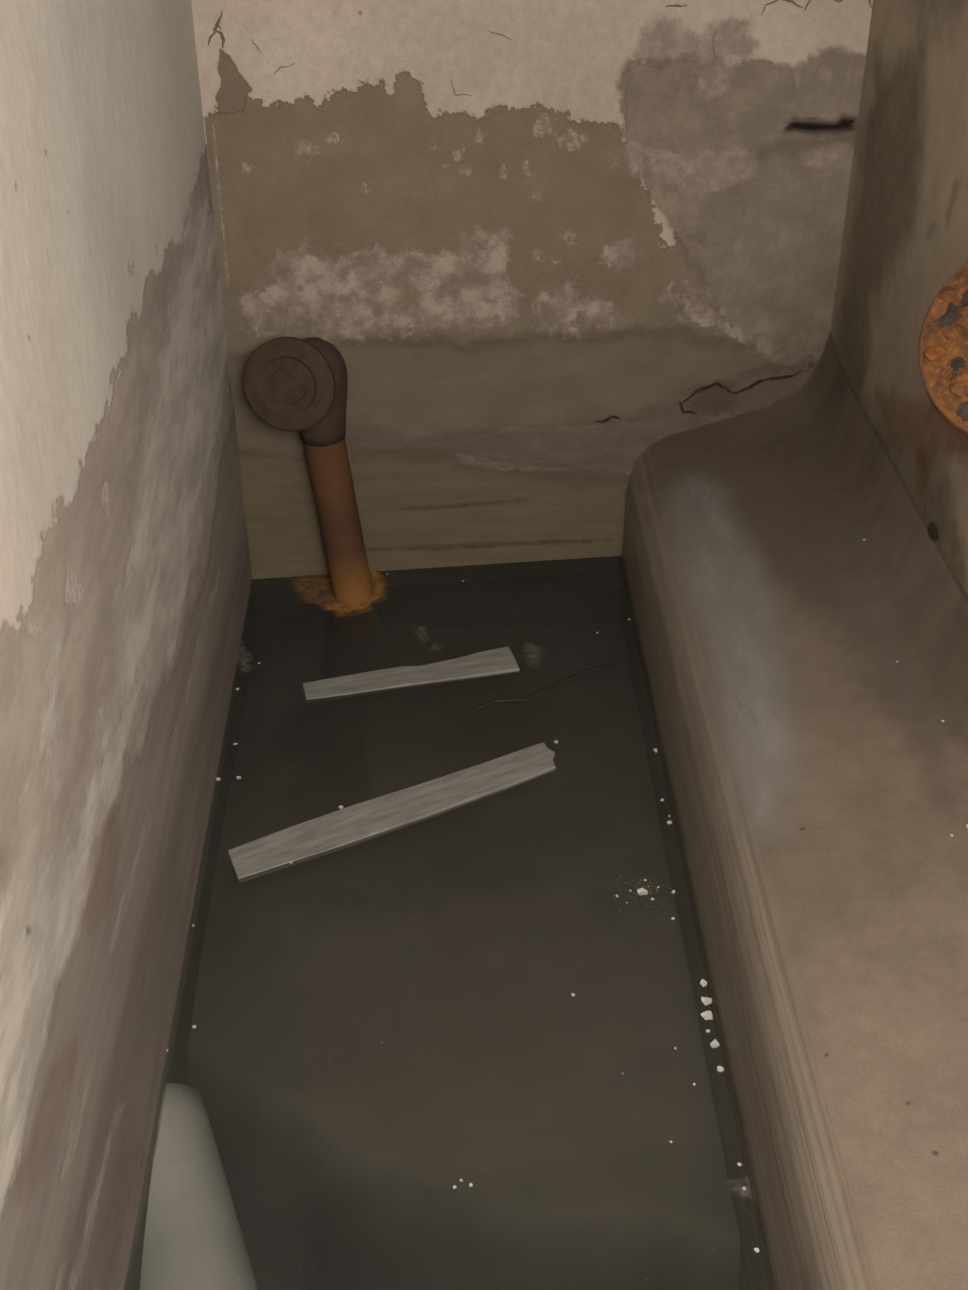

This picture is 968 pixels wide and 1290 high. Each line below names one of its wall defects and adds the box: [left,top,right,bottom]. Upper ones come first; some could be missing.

crack [761,0,873,15]
peeling [204,40,866,370]
water stain [837,65,919,407]
crack [595,416,621,424]
crack [679,370,802,415]
rust [922,265,968,426]
water stain [873,427,963,595]
peeling [0,147,234,1225]
water stain [0,356,330,1290]
water stain [240,227,817,1290]
peeling [700,979,720,1048]